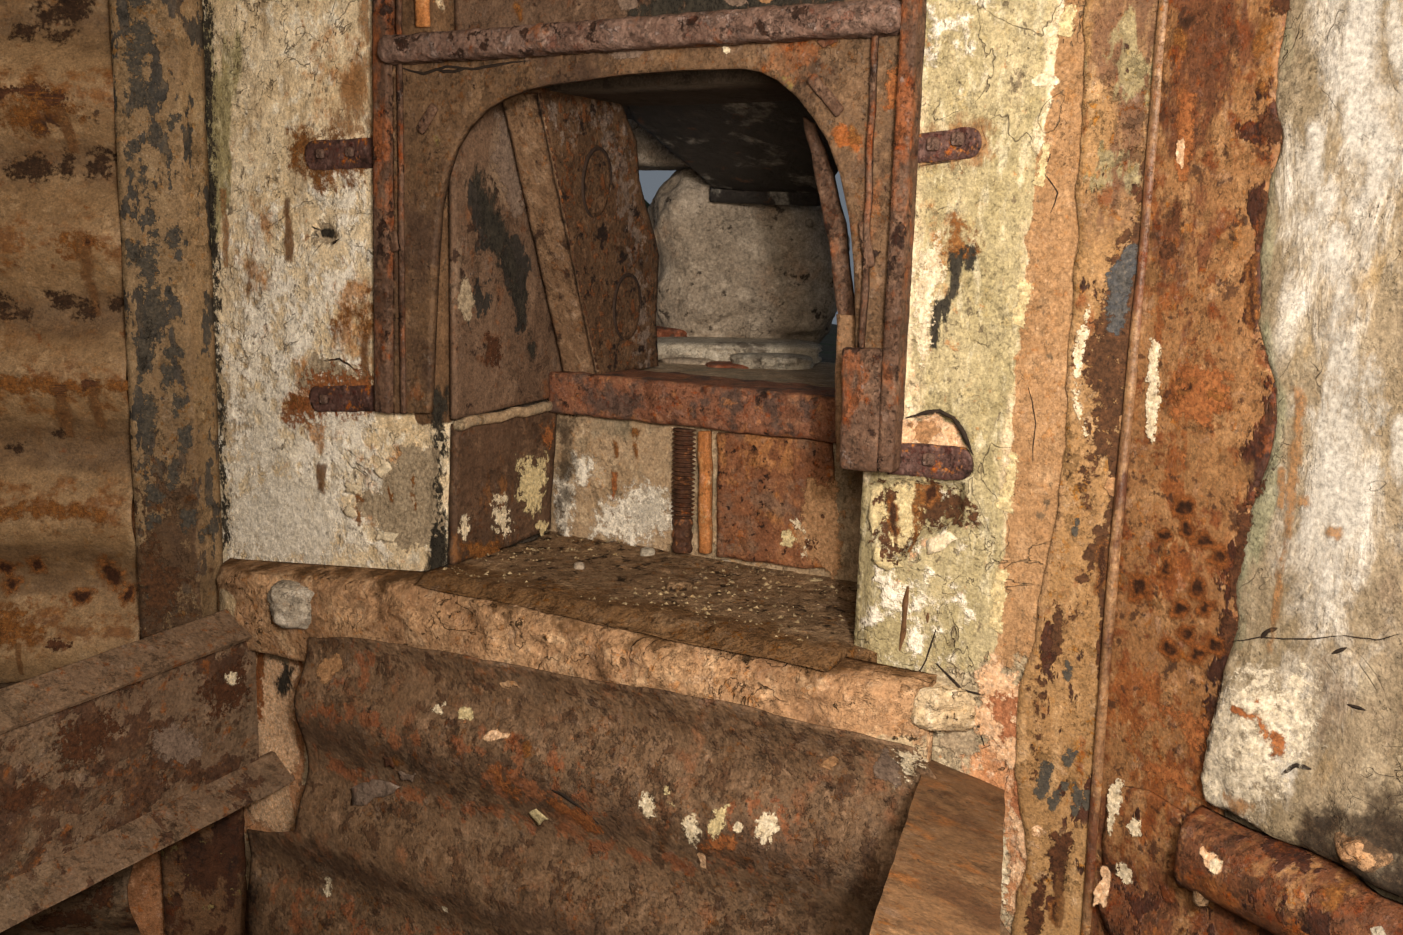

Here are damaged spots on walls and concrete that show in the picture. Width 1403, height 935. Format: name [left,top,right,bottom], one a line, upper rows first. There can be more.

corrosion [0,74,117,183]
corrosion [286,0,373,196]
flaking render [1033,141,1050,187]
flaking render [1058,4,1081,38]
corrosion [1174,83,1198,187]
corrosion [1252,0,1292,145]
peeling [122,0,194,507]
peeling [202,0,233,550]
peeling [867,161,1145,916]
corrosion [1127,338,1308,665]
corrosion [0,555,73,675]
crack [1233,627,1398,642]